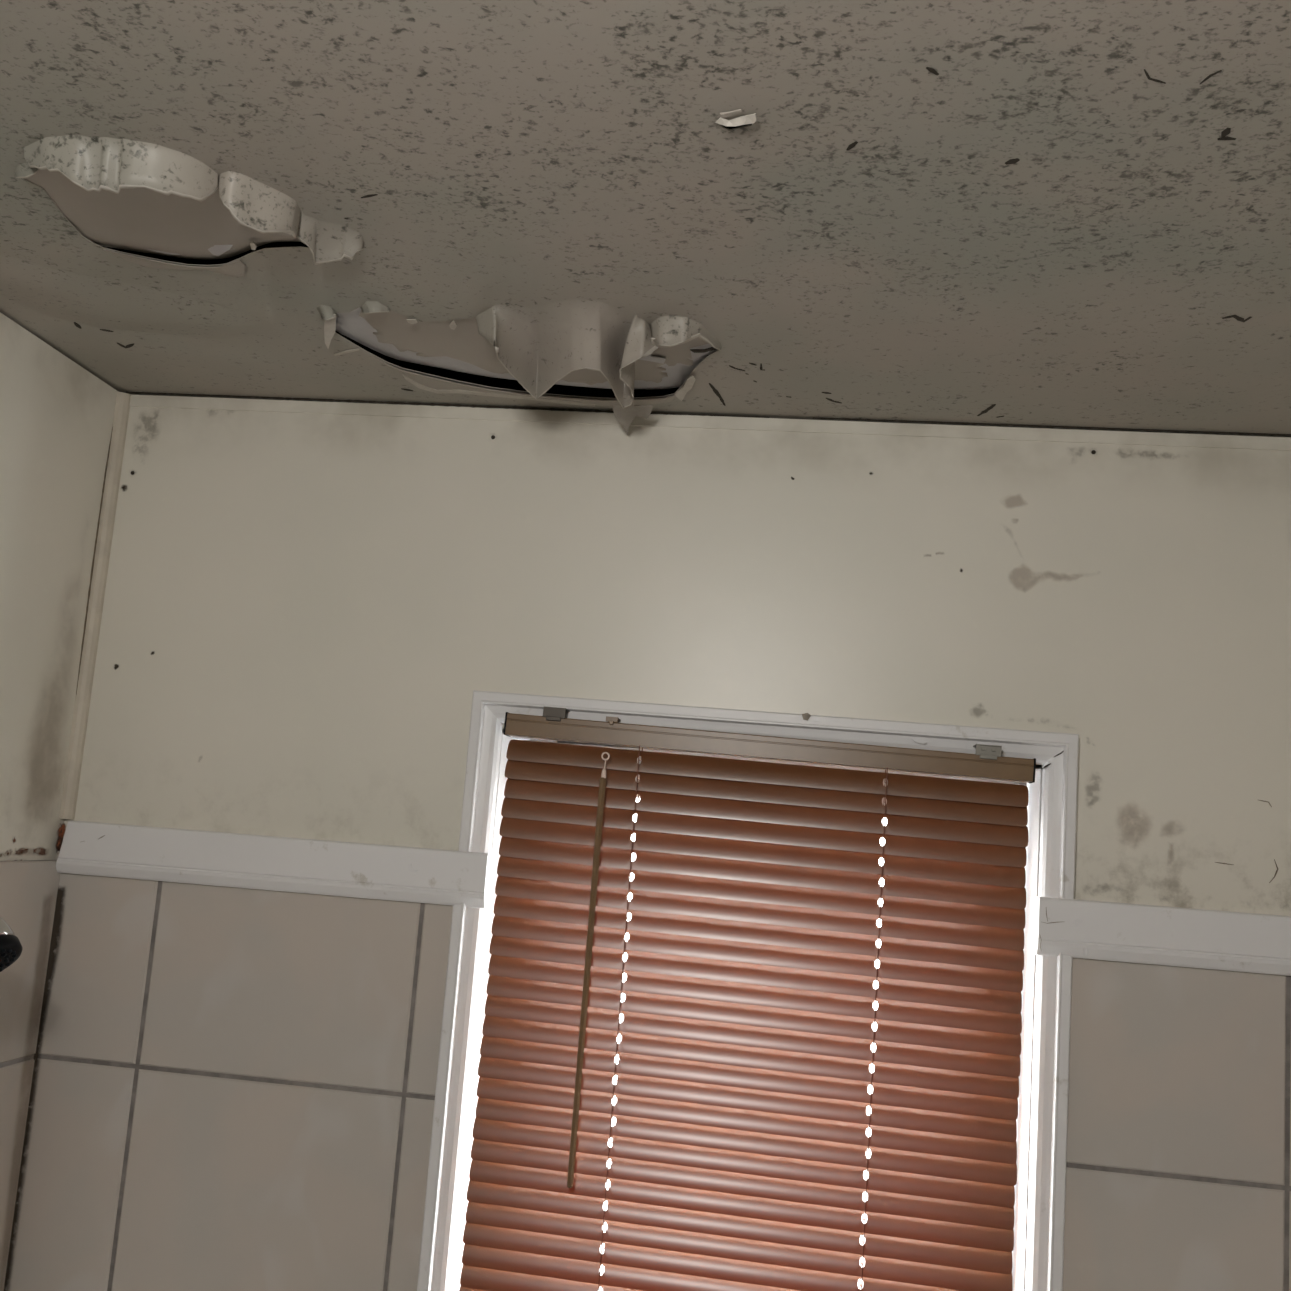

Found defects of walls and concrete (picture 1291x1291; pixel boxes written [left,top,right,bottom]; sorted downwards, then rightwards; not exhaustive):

peeling [14,135,364,277]
peeling [316,299,722,433]